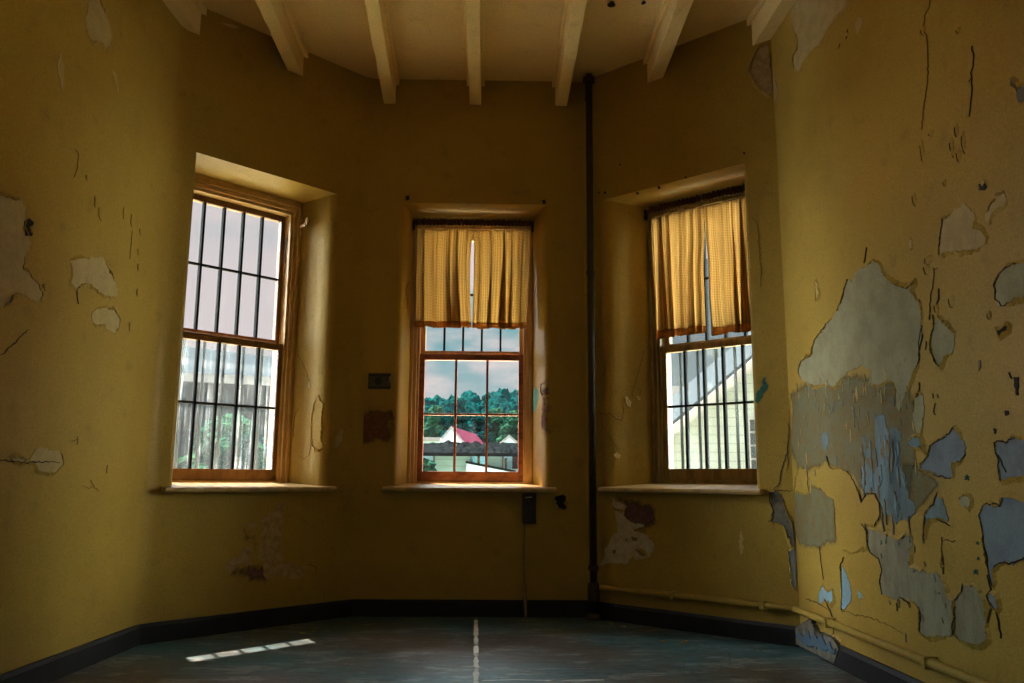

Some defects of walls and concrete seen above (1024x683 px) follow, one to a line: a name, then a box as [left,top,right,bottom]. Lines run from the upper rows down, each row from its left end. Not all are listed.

peeling [747,41,773,98]
peeling [791,0,847,72]
crack [921,0,930,130]
crack [967,46,975,117]
peeling [0,191,44,308]
peeling [938,180,1008,259]
peeling [68,255,121,334]
peeling [0,446,64,477]
peeling [768,247,1024,663]
peeling [600,498,654,566]